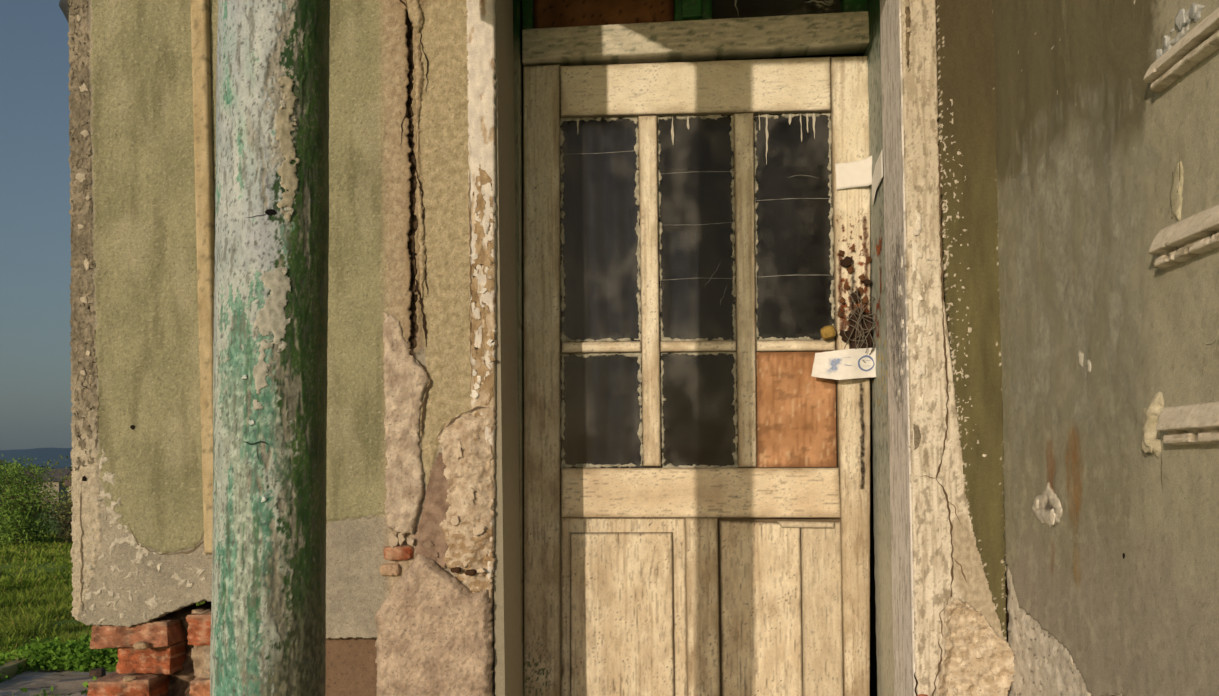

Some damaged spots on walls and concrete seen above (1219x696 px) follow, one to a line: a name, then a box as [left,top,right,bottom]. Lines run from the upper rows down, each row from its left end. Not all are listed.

peeling [276,76,300,225]
crack [399,0,429,355]
spalling [67,0,212,696]
peeling [241,266,291,426]
peeling [468,143,498,405]
rust [836,216,882,342]
flaking render [380,312,451,576]
spalling [1032,482,1063,528]
spalling [914,565,1091,696]